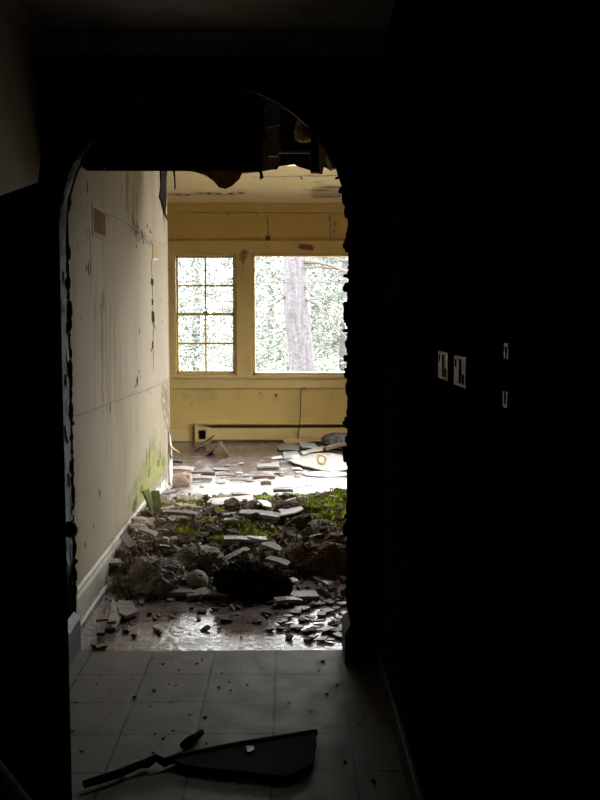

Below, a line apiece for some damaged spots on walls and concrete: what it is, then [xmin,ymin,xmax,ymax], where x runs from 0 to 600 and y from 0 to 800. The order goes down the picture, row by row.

crack [73,348,169,417]